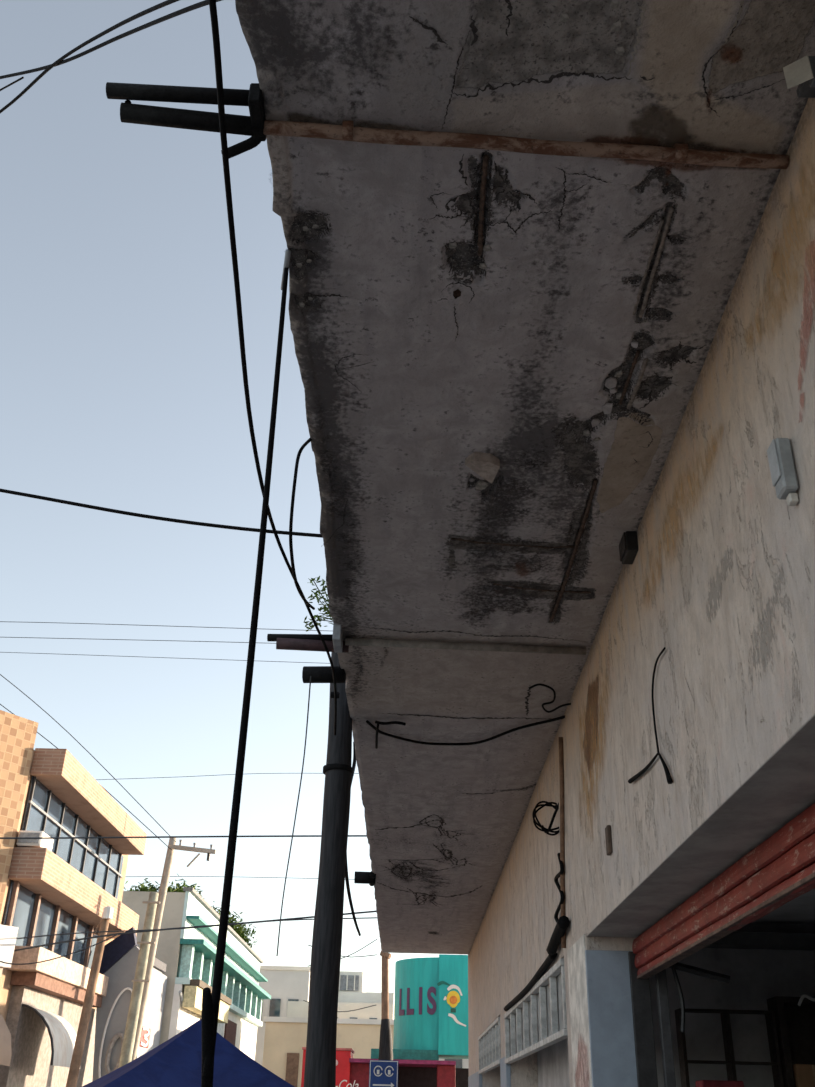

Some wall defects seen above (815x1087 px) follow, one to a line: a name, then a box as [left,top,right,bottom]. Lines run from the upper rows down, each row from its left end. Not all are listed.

crack [505,0,513,36]
crack [409,15,655,128]
crack [702,6,784,117]
rust [263,120,789,185]
damp [630,106,732,152]
spalling [444,150,706,624]
damp [457,478,550,623]
crack [375,815,482,907]